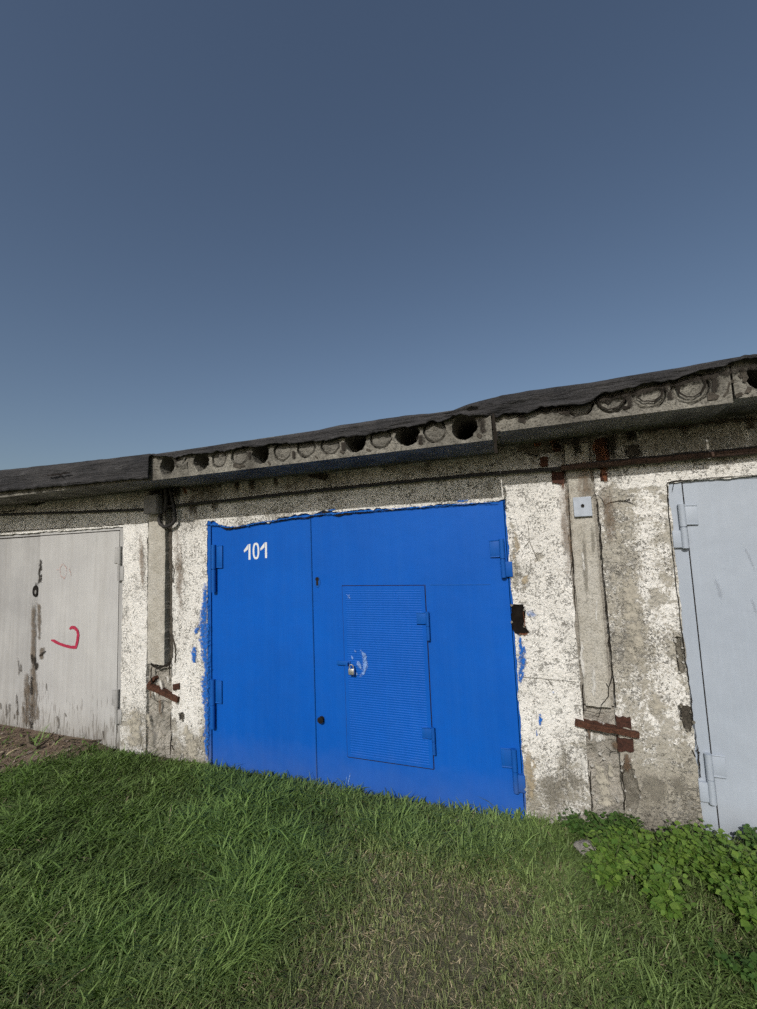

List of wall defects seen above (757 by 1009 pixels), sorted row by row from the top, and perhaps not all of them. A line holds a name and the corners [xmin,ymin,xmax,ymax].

spalling [510,604,529,635]
rust [22,604,44,725]
spalling [673,638,685,674]